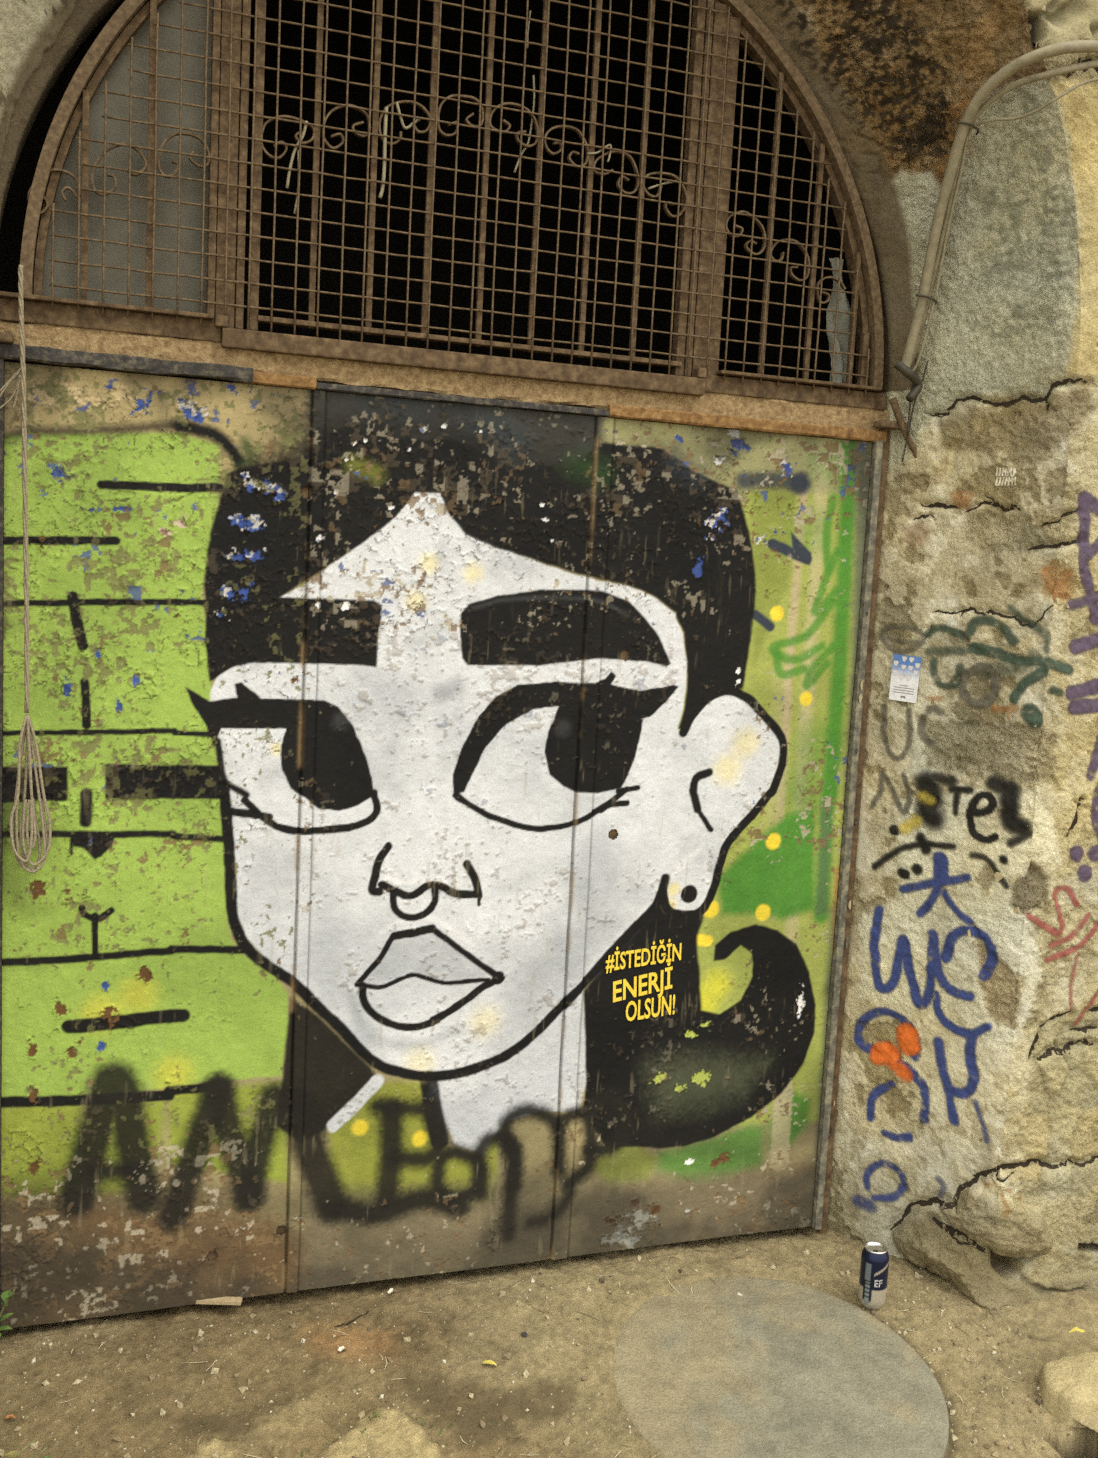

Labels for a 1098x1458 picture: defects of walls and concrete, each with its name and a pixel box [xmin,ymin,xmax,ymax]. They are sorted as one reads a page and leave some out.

water stain [777,0,950,162]
crack [926,378,1087,417]